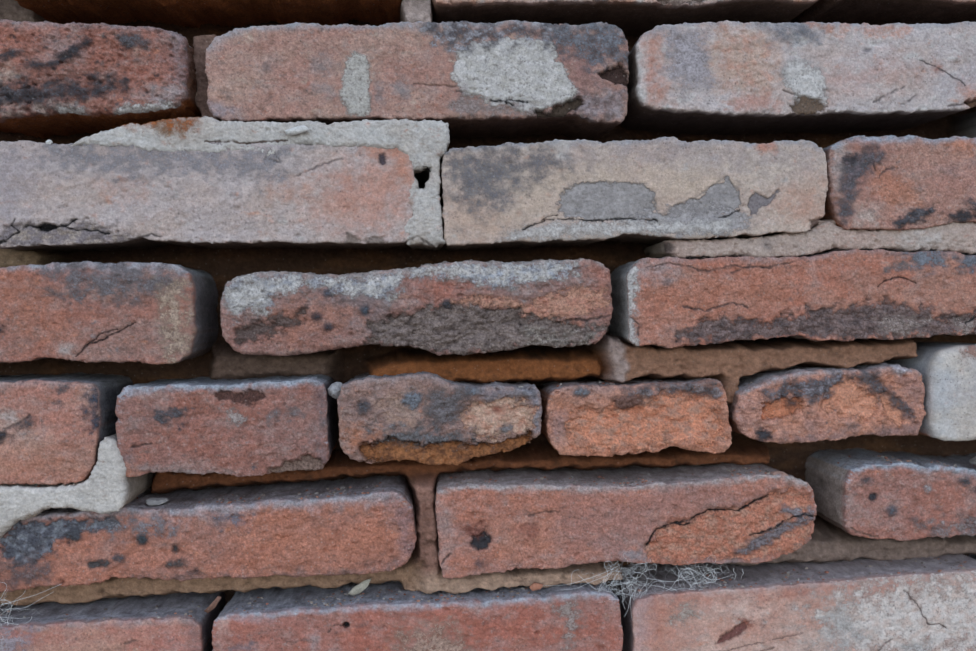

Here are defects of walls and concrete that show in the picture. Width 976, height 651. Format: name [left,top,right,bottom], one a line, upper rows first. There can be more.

peeling [558,176,778,239]
crack [0,219,110,244]
crack [904,591,946,628]